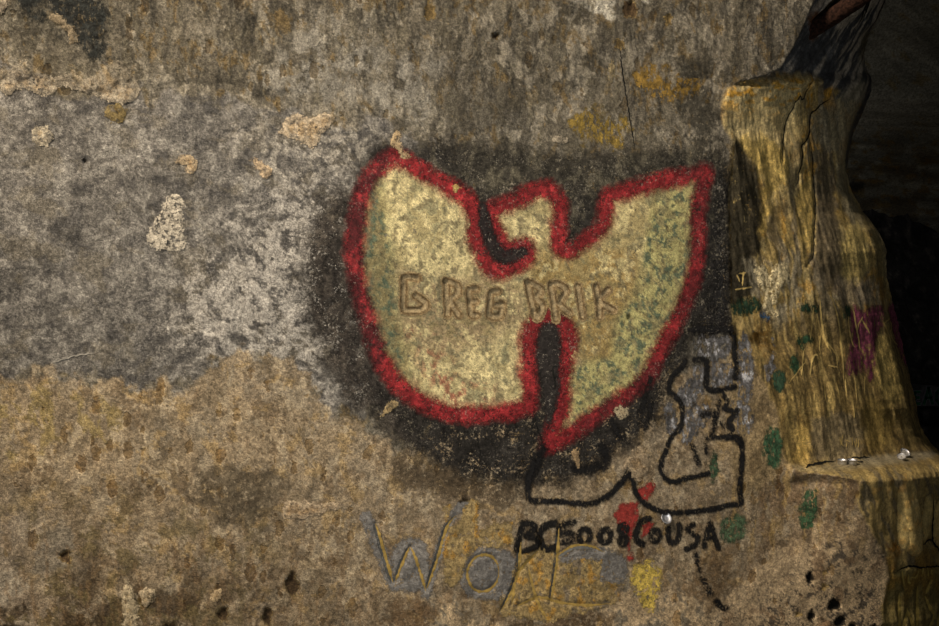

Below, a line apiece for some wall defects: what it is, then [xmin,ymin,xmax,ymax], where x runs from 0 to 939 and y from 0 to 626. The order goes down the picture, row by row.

crack [782,83,830,264]
crack [806,456,870,468]
crack [895,503,939,573]